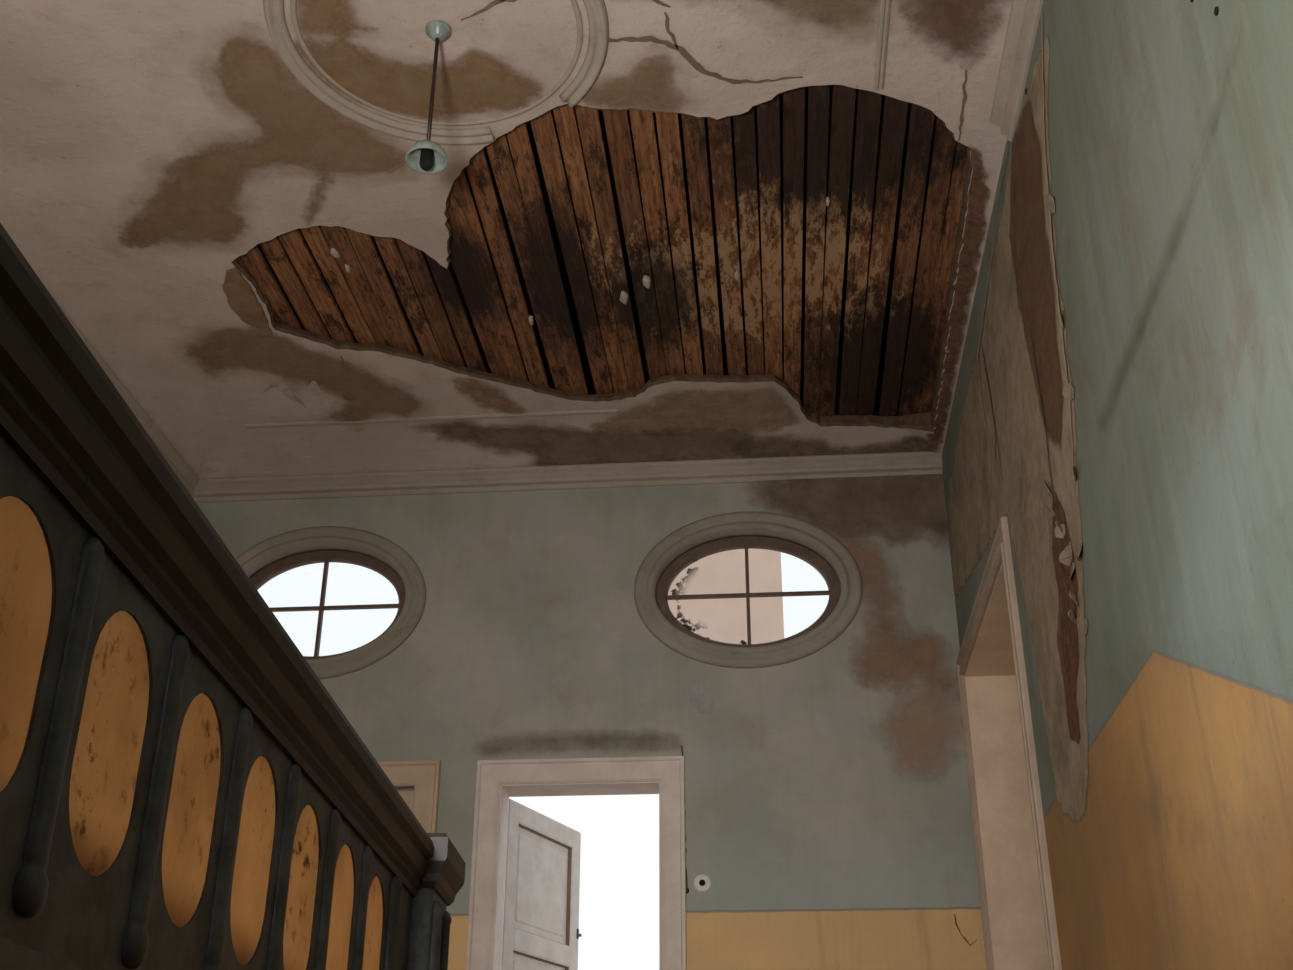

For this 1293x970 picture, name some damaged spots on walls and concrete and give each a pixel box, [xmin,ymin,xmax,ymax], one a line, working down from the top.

leakage [294,0,540,118]
crack [460,0,517,21]
leakage [583,63,677,113]
crack [608,0,803,84]
leakage [908,0,997,53]
leakage [121,39,406,248]
spalling [232,117,972,435]
leakage [441,148,989,466]
leakage [189,329,416,421]
peeling [949,36,1088,821]
crack [954,914,977,946]